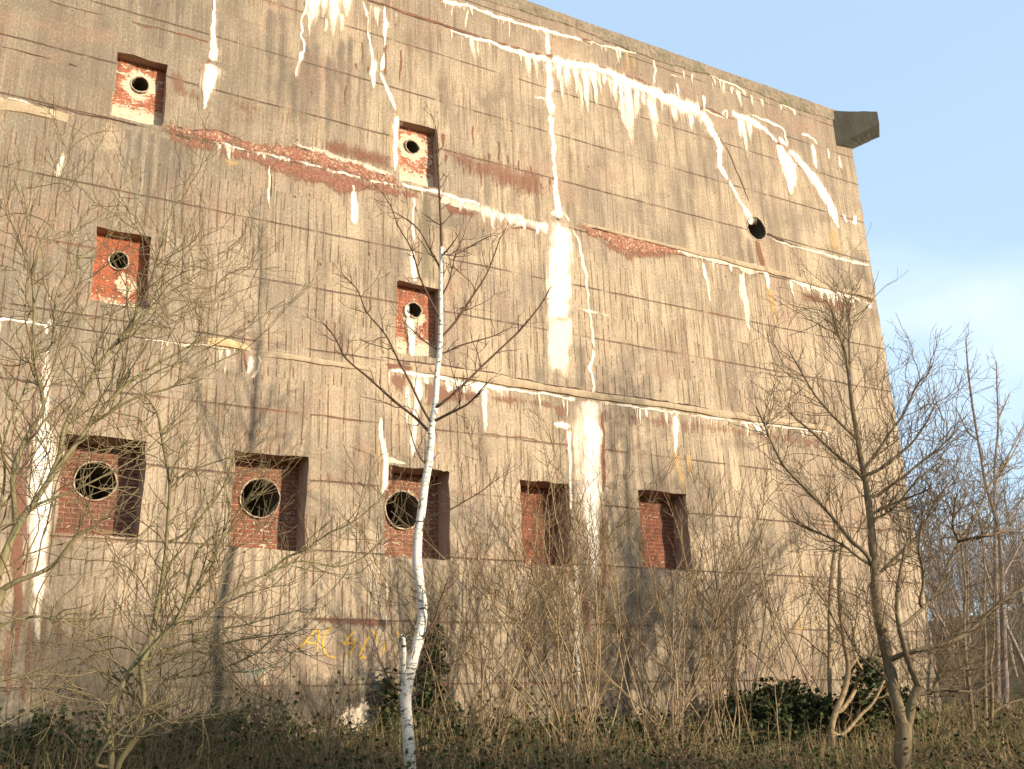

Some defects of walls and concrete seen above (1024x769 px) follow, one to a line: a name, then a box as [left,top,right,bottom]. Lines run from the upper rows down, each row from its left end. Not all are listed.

efflorescence [307,0,352,36]
efflorescence [199,0,224,109]
efflorescence [711,75,796,115]
spalling [162,122,403,191]
efflorescence [801,133,842,169]
spalling [578,225,682,261]
leakage [214,141,829,708]
leakage [23,351,379,733]